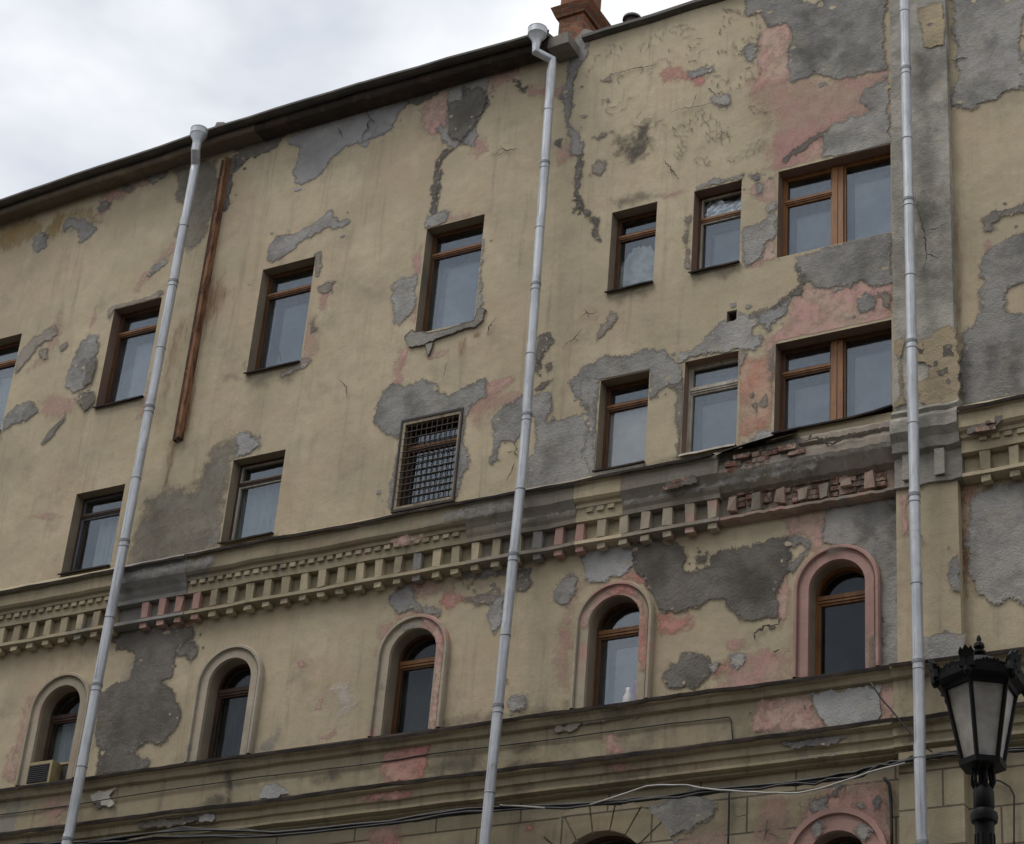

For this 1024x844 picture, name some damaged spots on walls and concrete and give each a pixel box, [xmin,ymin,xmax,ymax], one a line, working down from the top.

flaking render [223,76,494,229]
crack [585,9,770,179]
flaking render [742,0,891,163]
flaking render [917,0,1024,110]
flaking render [373,238,492,509]
flaking render [488,232,908,670]
flaking render [946,478,1024,605]
flaking render [94,621,204,775]
flaking render [380,565,533,729]
peeling [661,648,791,694]
crack [754,618,782,653]
flaking render [752,685,894,759]